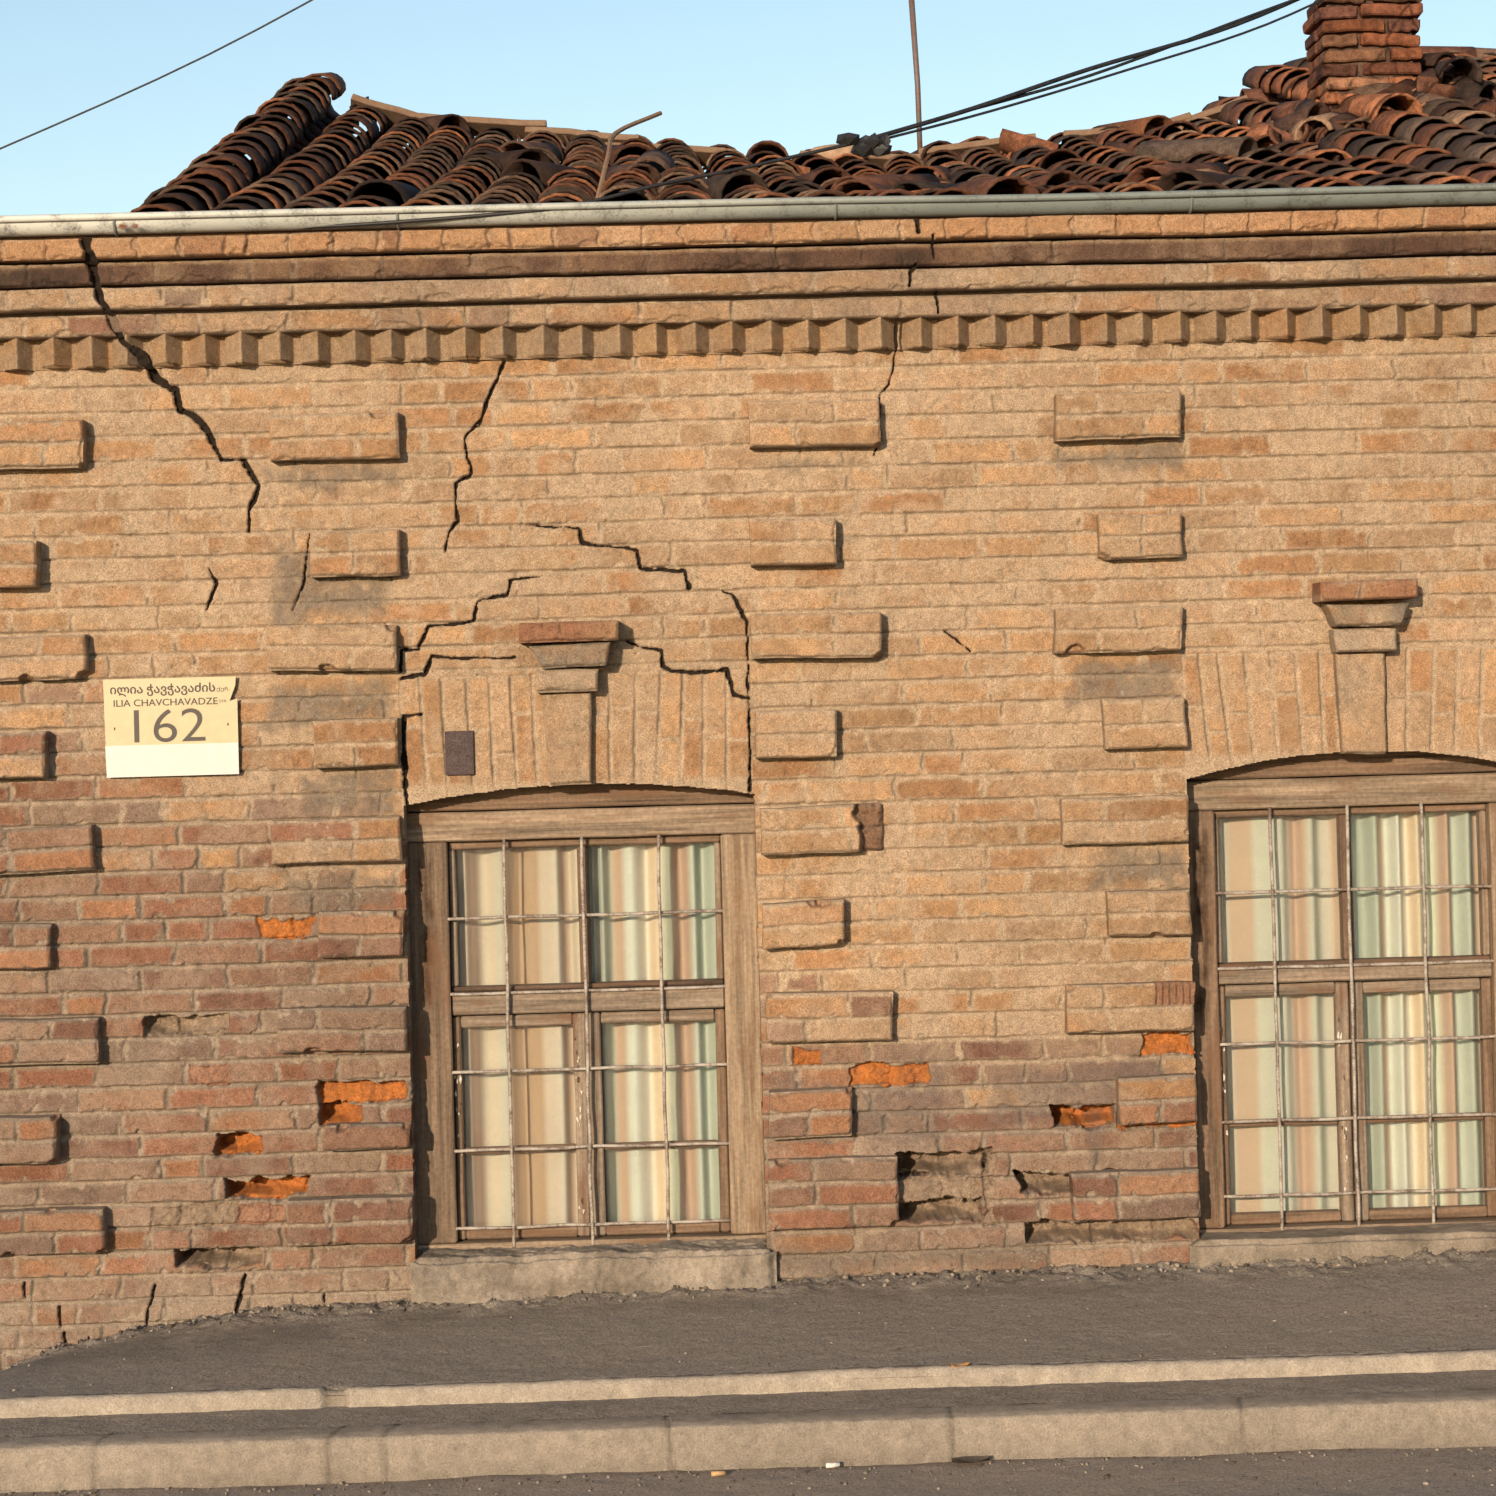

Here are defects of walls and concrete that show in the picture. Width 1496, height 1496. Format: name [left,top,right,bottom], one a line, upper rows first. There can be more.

crack [874,219,939,455]
crack [81,238,261,532]
crack [444,362,505,552]
crack [207,569,219,610]
crack [399,576,540,804]
crack [533,525,752,790]
spalling [215,1132,263,1156]
spalling [317,1080,407,1126]
spalling [849,1061,931,1087]
spalling [1049,1104,1197,1131]
spalling [227,1175,311,1225]
spalling [895,1147,998,1226]